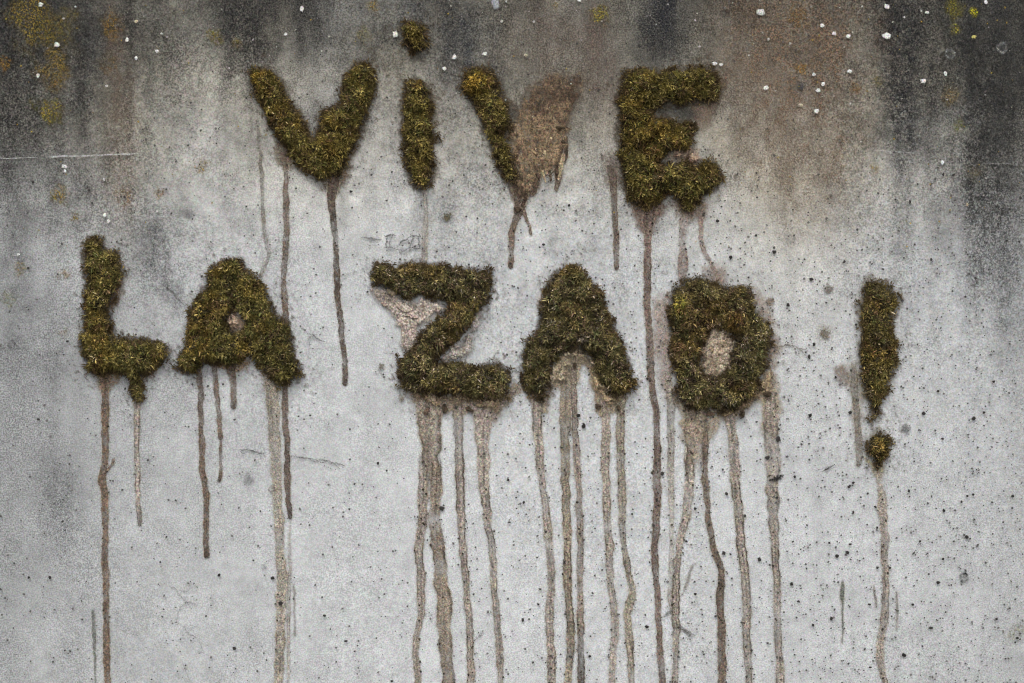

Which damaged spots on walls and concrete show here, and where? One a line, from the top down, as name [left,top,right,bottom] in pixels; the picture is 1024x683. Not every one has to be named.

water stain [280,151,291,320]
water stain [327,168,348,386]
water stain [91,373,115,683]
water stain [196,363,237,558]
water stain [265,380,296,683]
water stain [412,388,517,683]
water stain [532,362,585,683]
water stain [599,389,636,683]
water stain [643,201,727,683]
water stain [724,412,752,683]
water stain [763,371,785,683]
water stain [850,363,898,683]